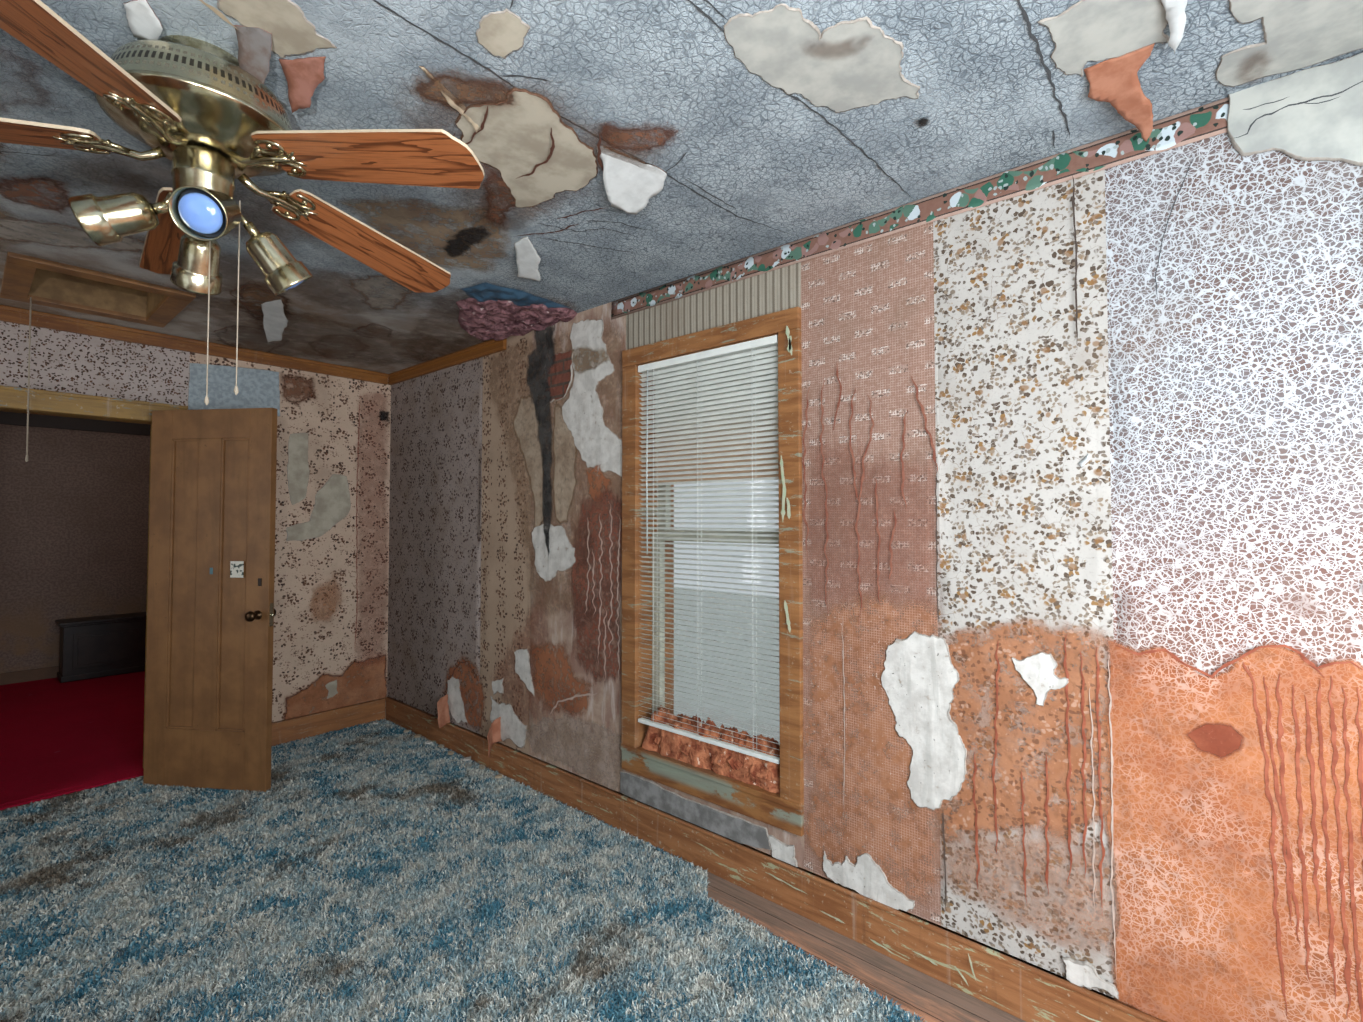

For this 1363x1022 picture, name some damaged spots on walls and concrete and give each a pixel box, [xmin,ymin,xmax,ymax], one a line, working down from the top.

leakage [0,177,144,252]
crack [373,0,551,88]
peeling [419,66,667,214]
crack [688,0,727,33]
crack [780,88,911,197]
crack [1017,0,1070,148]
peeling [1038,0,1187,142]
peeling [1215,0,1363,166]
leakage [513,396,577,555]
peeling [881,631,967,811]
leakage [1116,644,1363,691]
leakage [1063,634,1117,980]